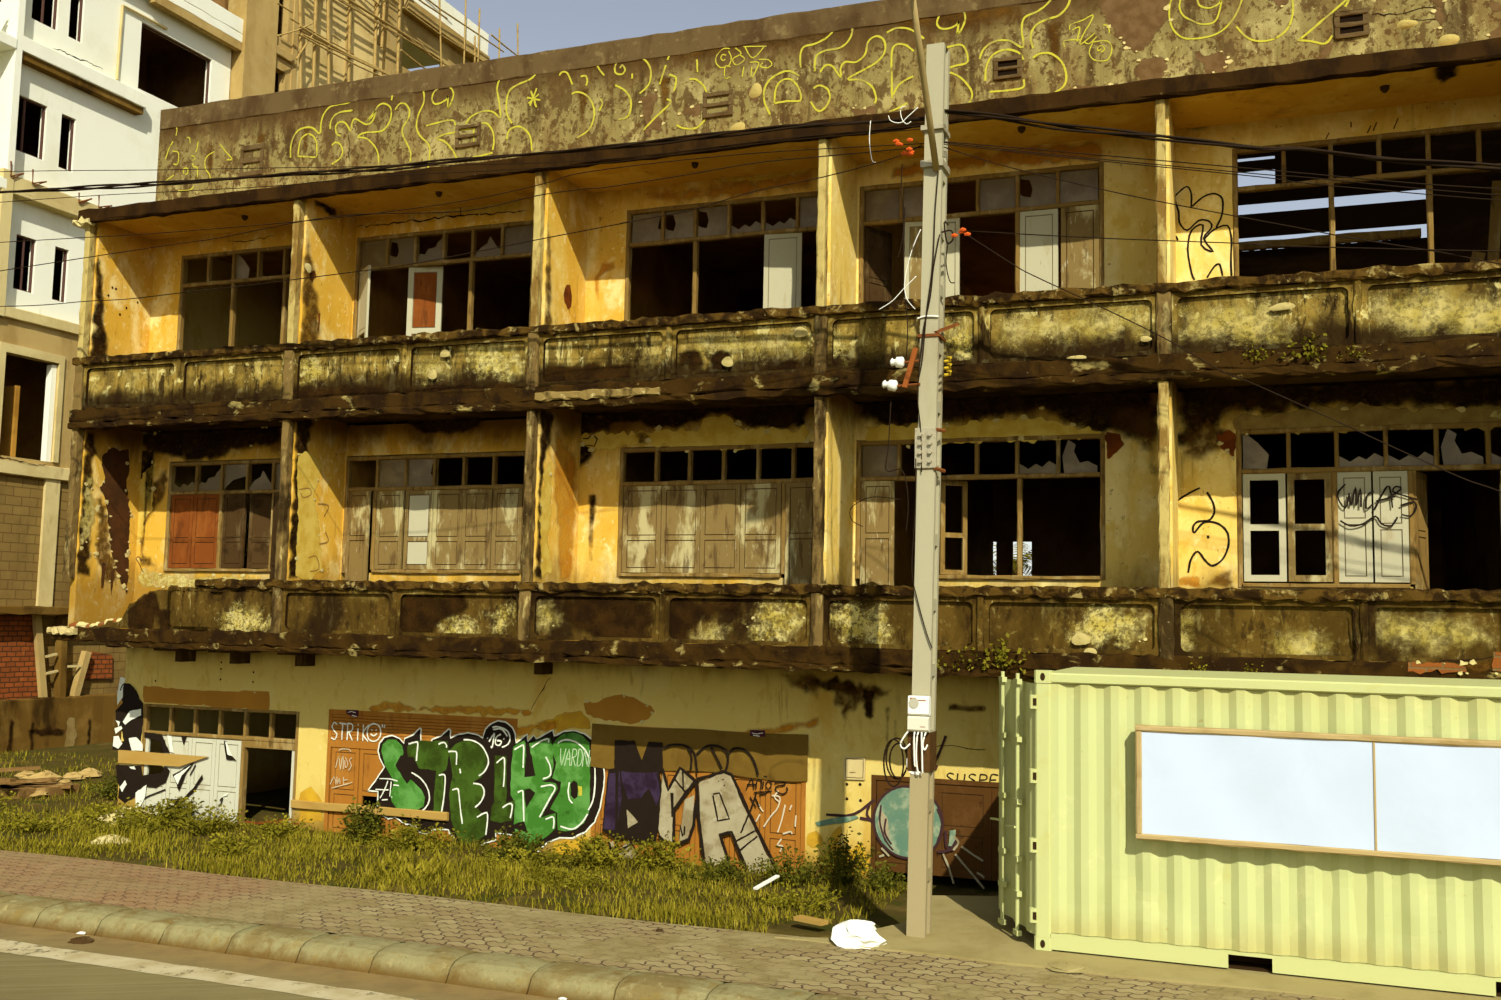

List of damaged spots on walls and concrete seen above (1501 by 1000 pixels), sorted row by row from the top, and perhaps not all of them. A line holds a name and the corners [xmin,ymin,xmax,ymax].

peeling [1430,0,1447,30]
peeling [1070,0,1175,90]
peeling [1194,51,1233,74]
peeling [638,89,701,137]
damp [88,260,107,357]
damp [1374,288,1501,334]
damp [680,333,808,377]
peeling [80,447,245,593]
damp [127,592,170,630]
damp [401,594,515,638]
damp [1069,604,1148,646]
flaking render [1408,652,1501,676]